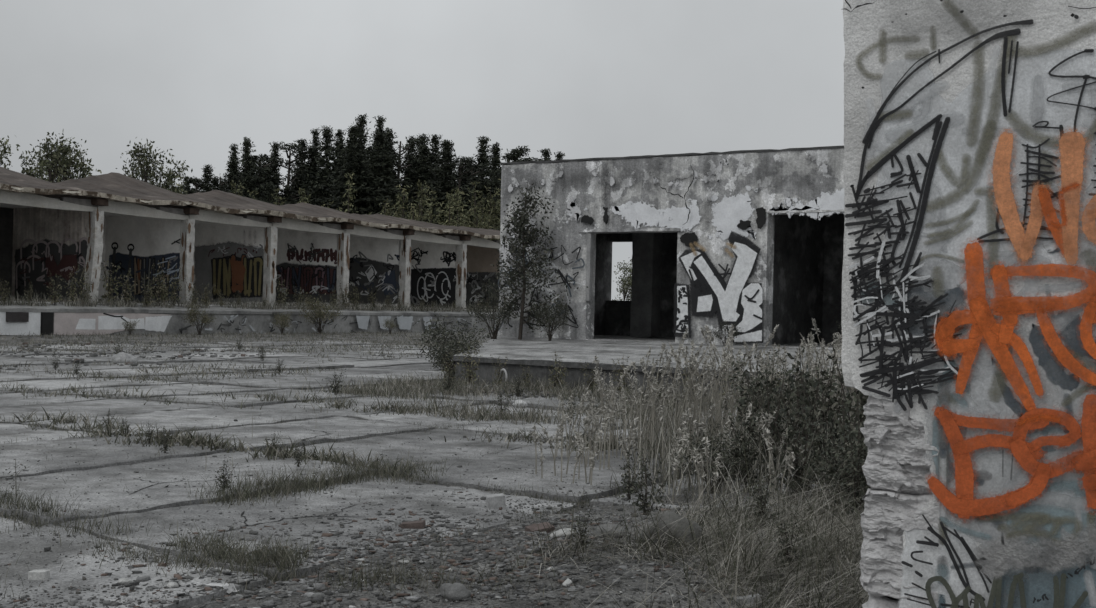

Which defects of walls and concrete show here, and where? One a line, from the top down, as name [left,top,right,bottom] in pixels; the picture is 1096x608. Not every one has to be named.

peeling [565,198,588,224]
peeling [612,158,758,240]
peeling [770,185,854,220]
spalling [860,390,941,608]
crack [215,504,365,533]